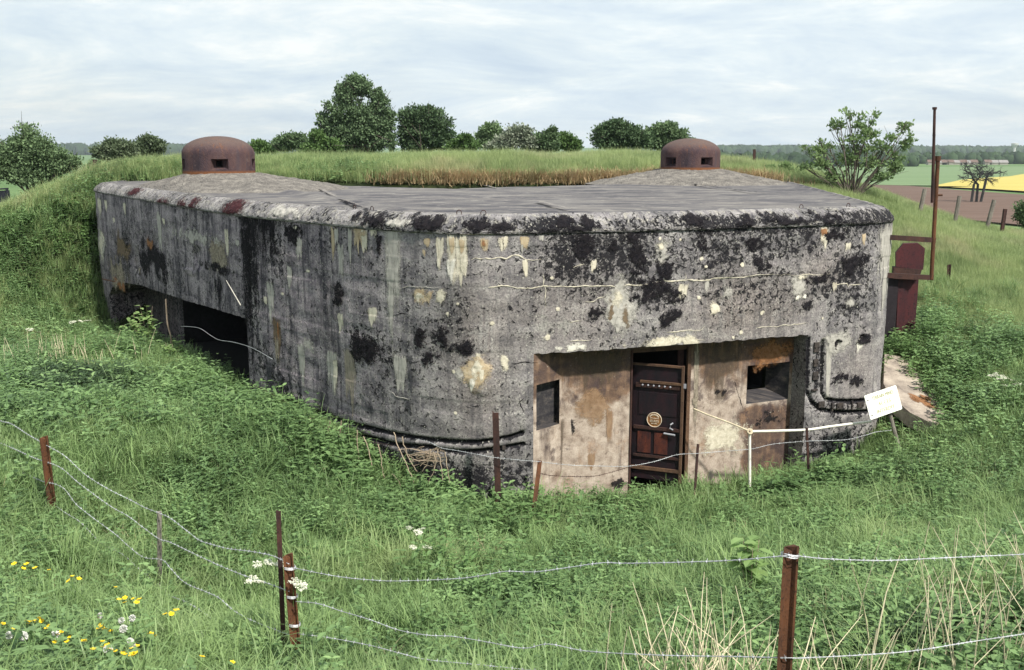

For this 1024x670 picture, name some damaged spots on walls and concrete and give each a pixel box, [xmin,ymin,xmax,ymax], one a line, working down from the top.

leakage [148,204,312,392]
leakage [327,216,491,418]
peeling [604,274,637,338]
leakage [568,232,688,331]
crack [472,254,813,341]
peeling [456,355,509,391]